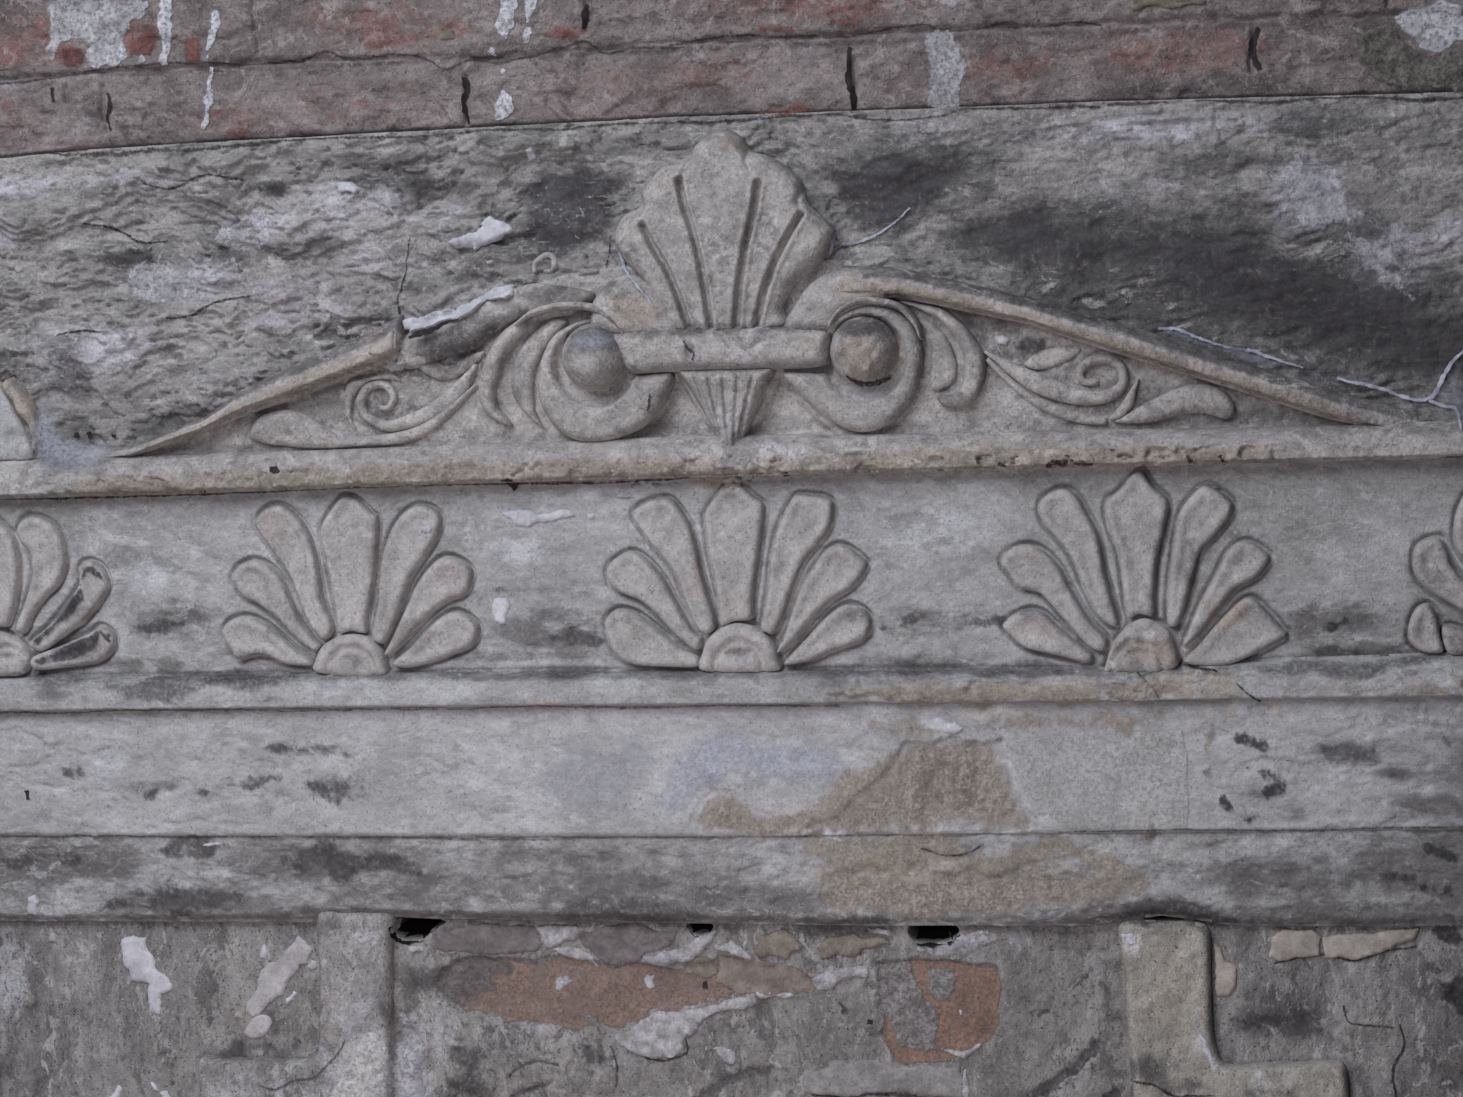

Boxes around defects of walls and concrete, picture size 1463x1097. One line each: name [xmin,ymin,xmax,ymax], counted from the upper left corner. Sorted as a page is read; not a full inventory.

spalling [1349,0,1463,96]
spalling [292,284,517,398]
crack [7,477,689,500]
crack [0,705,840,714]
damp [656,734,847,811]
crack [0,835,695,847]
peeling [121,935,172,1014]
peeling [235,935,317,1039]
flaking render [424,922,817,1087]
peeling [1269,927,1420,964]
spalling [508,1060,559,1097]
spalling [700,1046,771,1097]